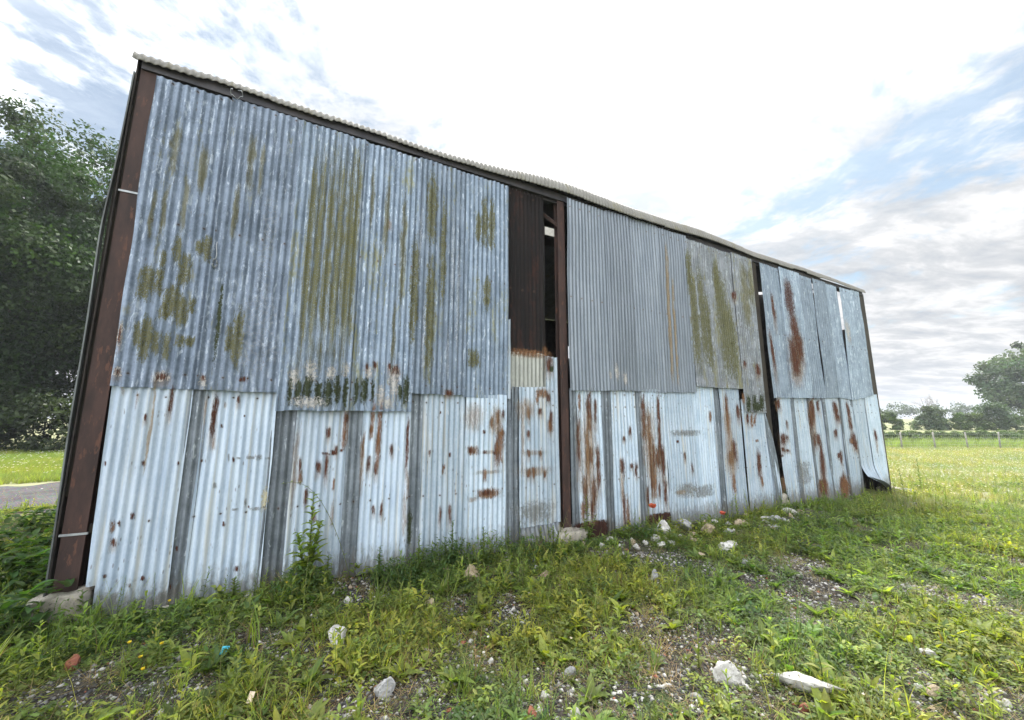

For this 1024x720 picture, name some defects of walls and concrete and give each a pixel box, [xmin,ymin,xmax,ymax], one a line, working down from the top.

damp [132,149,212,363]
damp [212,273,245,368]
damp [286,141,448,411]
damp [475,193,496,254]
damp [483,275,491,311]
rust [508,187,554,372]
damp [685,248,754,382]
rust [361,401,410,475]
rust [468,410,505,499]
rust [574,390,609,537]
rust [620,389,671,529]
rust [808,400,858,498]